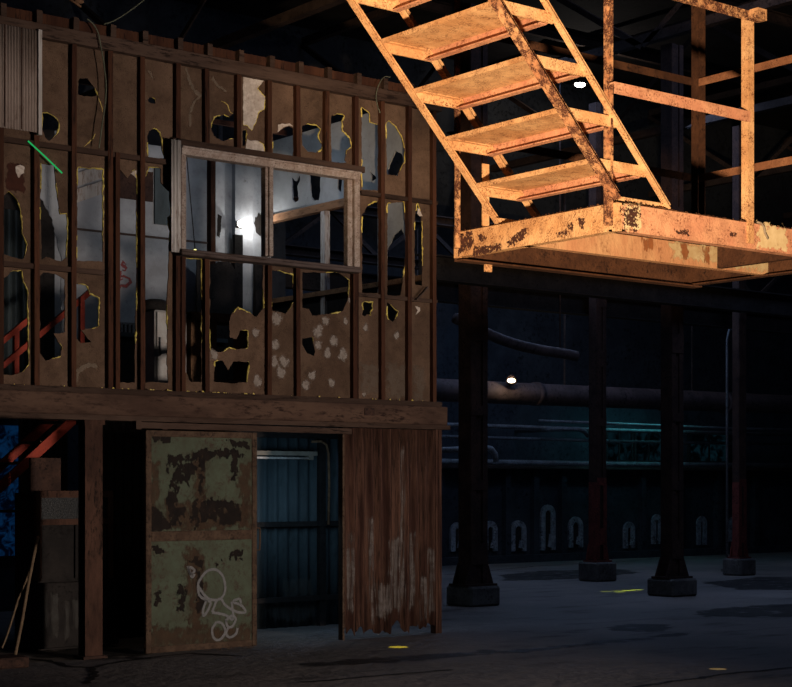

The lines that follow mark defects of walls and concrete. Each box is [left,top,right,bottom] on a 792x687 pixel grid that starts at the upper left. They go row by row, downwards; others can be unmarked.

peeling [152,439,250,532]
peeling [176,556,206,613]
water stain [346,534,355,611]
water stain [369,510,435,625]